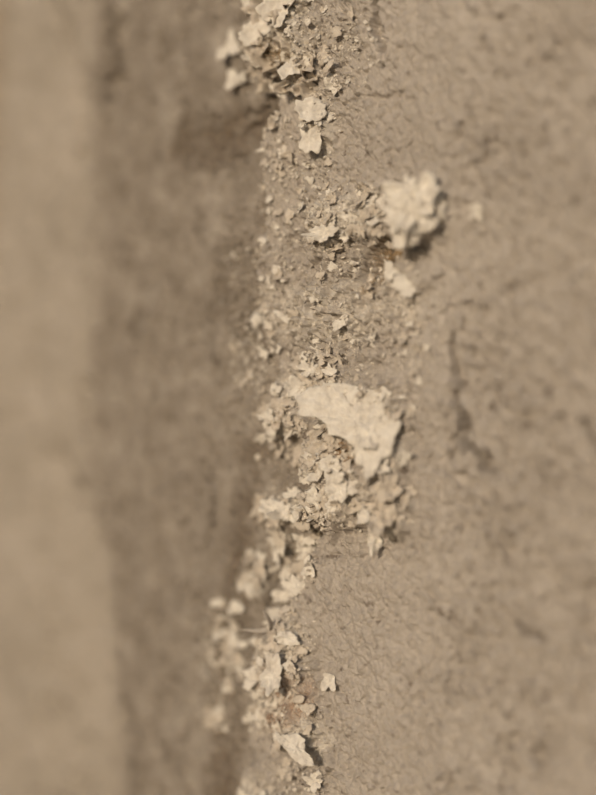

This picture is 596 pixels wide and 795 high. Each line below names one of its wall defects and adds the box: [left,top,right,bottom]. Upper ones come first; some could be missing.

flaking render [160,0,459,795]